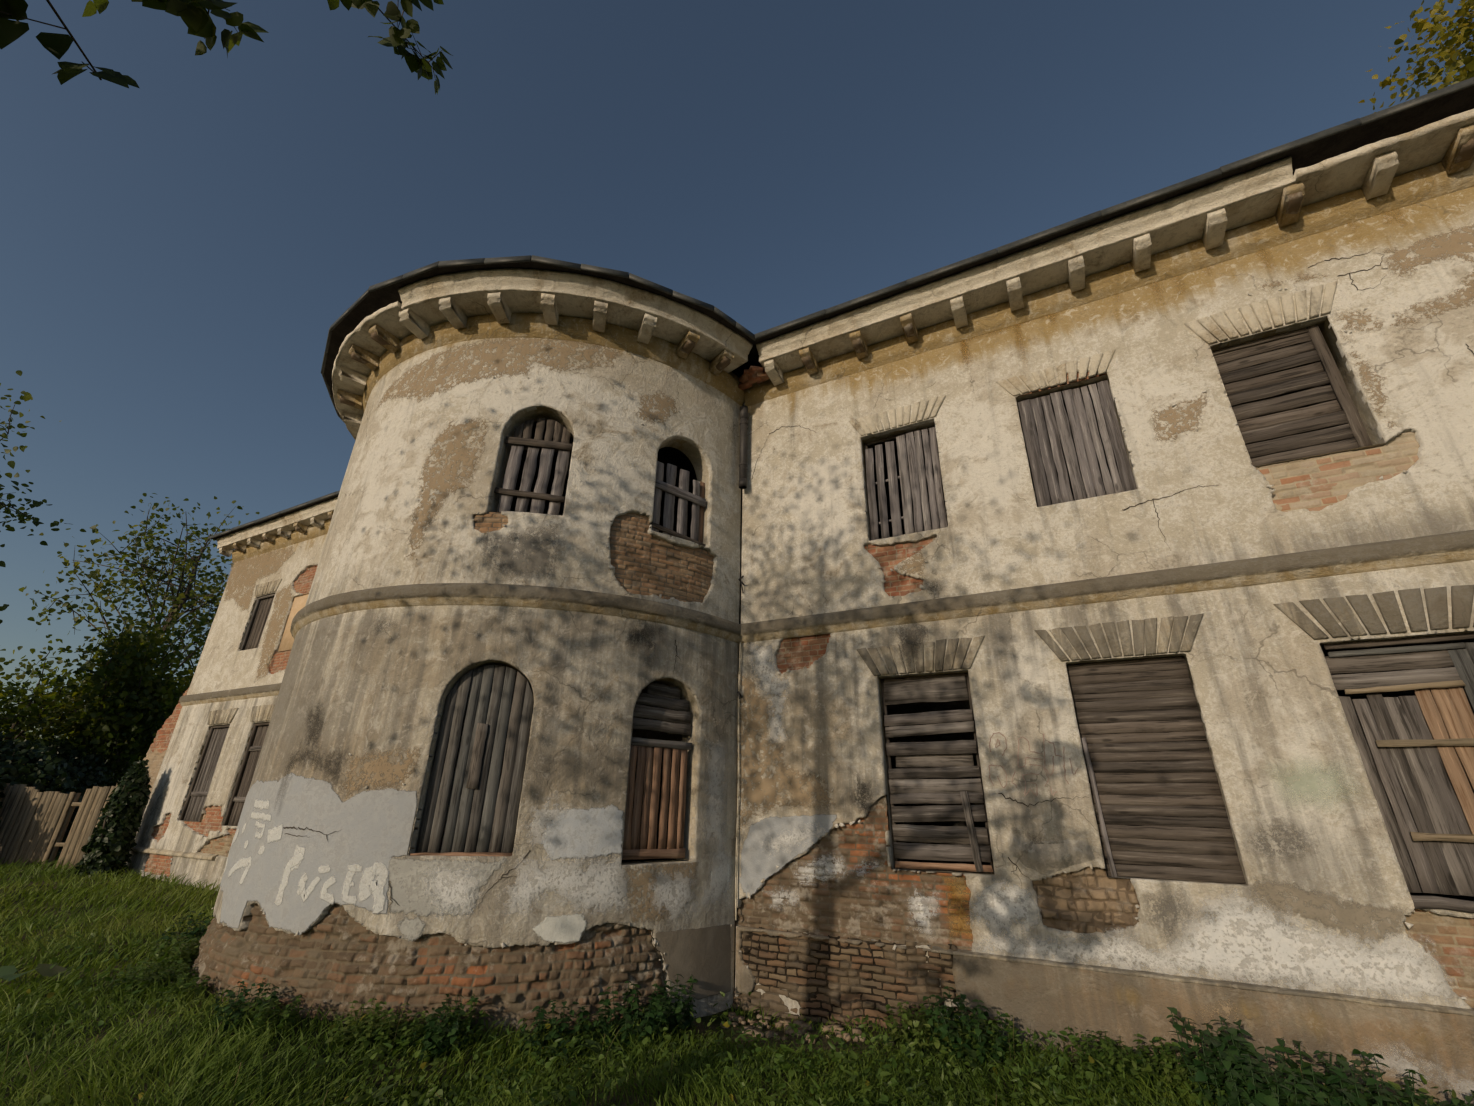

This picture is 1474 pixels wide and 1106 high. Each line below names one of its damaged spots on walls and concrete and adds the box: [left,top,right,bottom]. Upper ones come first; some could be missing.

crack [1308,248,1384,290]
flaking render [1338,226,1474,333]
flaking render [1256,351,1420,512]
flaking render [224,547,318,682]
flaking render [607,513,718,603]
flaking render [776,633,831,675]
flaking render [865,537,937,596]
flaking render [736,675,835,830]
flaking render [143,806,236,877]
flaking render [191,795,997,1038]
flaking render [1032,863,1140,936]
flaking render [1253,880,1474,1008]